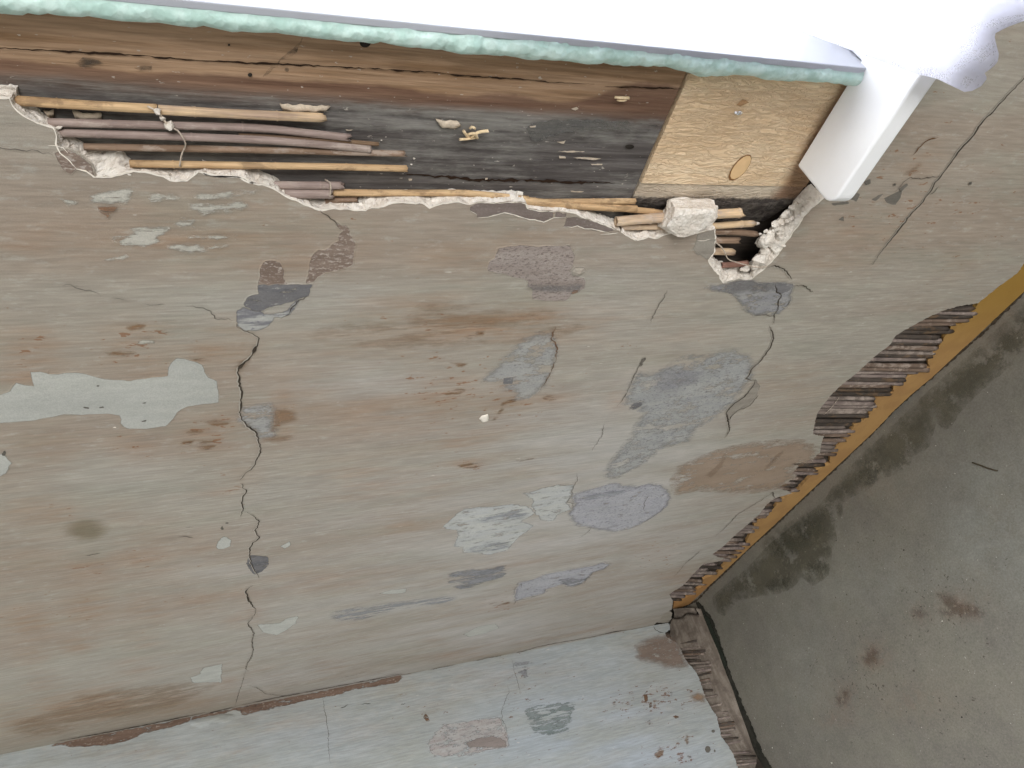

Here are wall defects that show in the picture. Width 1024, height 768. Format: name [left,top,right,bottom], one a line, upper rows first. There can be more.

peeling [0,84,670,331]
peeling [691,179,871,316]
peeling [872,184,908,205]
crack [872,78,1024,264]
crack [60,307,664,760]
peeling [484,335,555,399]
peeling [523,484,574,521]
peeling [513,562,610,601]
peeling [607,351,761,477]
leakage [672,441,814,494]
crack [725,265,811,435]
peeling [427,716,509,758]